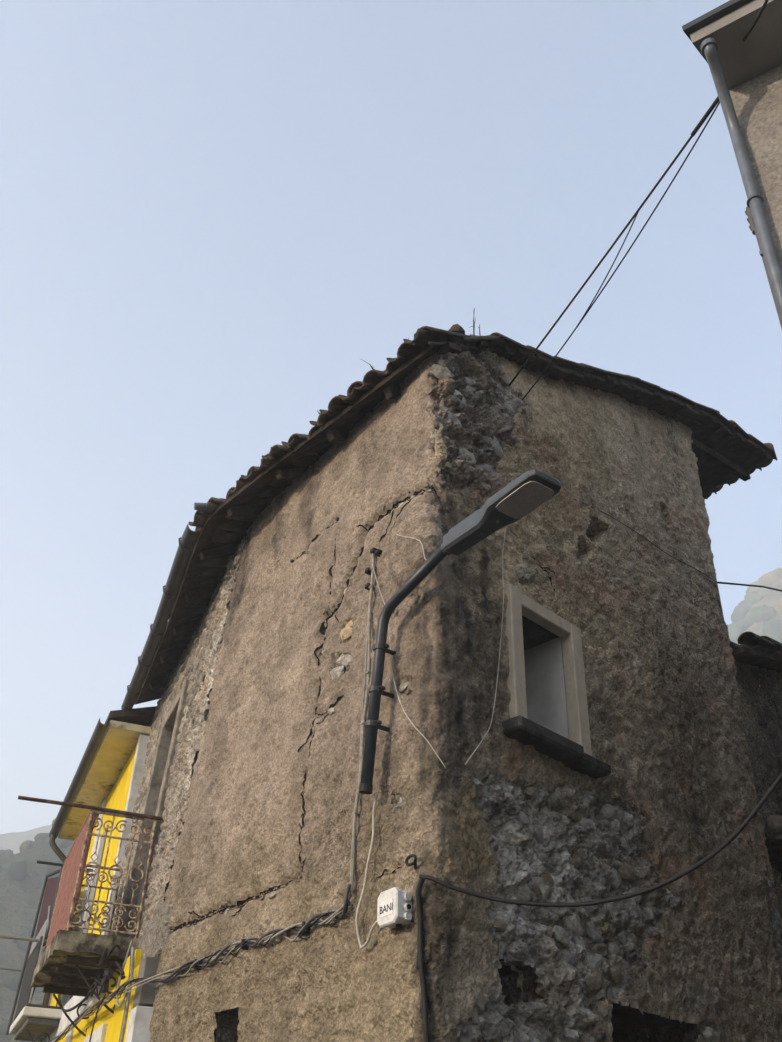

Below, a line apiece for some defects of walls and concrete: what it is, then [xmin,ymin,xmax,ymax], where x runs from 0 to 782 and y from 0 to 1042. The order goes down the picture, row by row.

spalling [426,349,525,501]
flaking render [139,539,247,944]
crack [170,482,441,933]
spalling [457,764,683,1042]